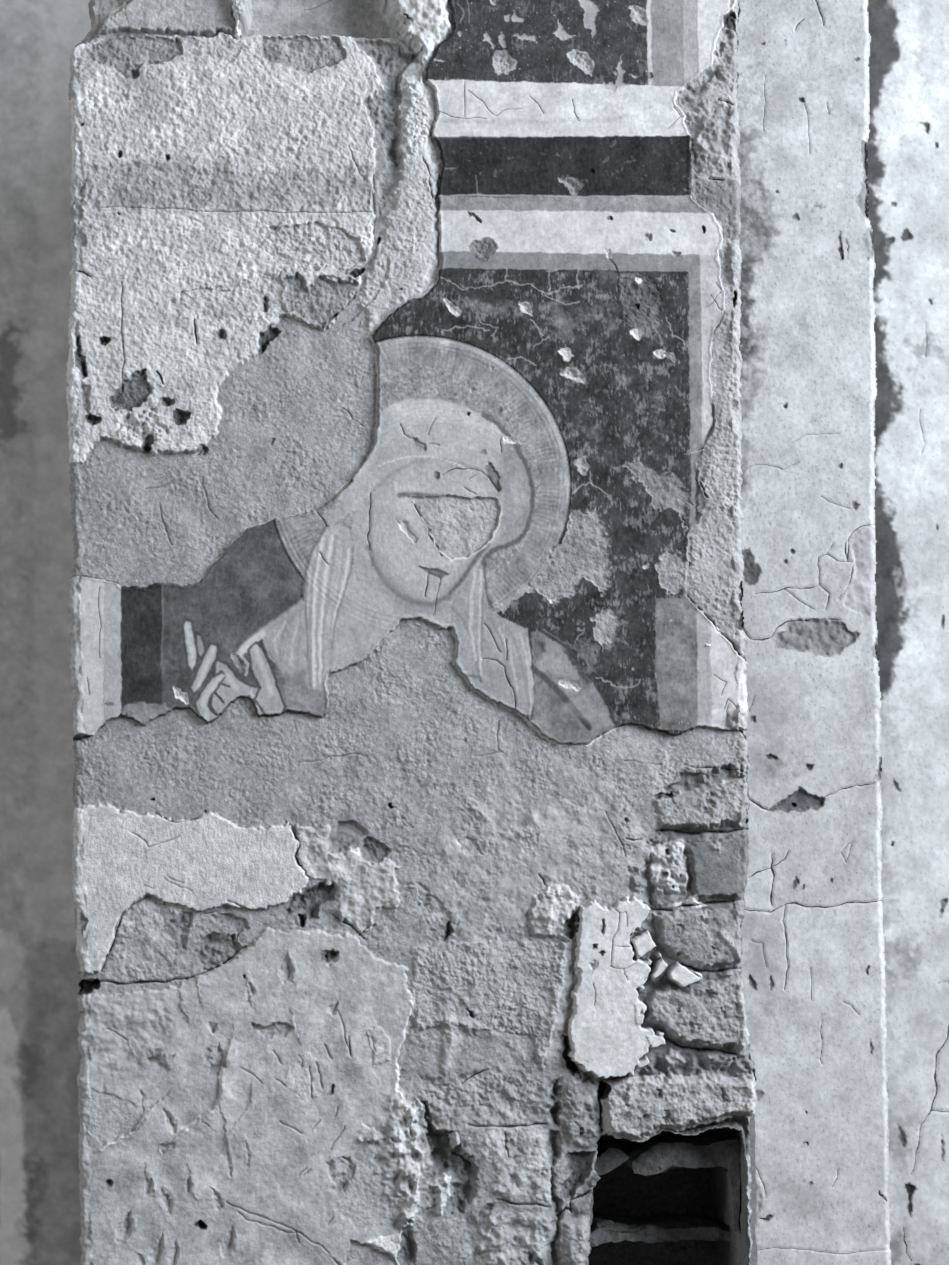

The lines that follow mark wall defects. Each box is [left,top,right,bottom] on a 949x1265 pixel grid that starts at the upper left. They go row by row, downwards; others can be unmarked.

spalling [260,35,420,172]
spalling [168,221,381,354]
spalling [109,368,171,458]
crack [690,496,873,739]
spalling [775,525,875,658]
water stain [892,566,927,632]
crack [690,766,784,810]
crack [82,896,245,985]
spalling [80,895,250,996]
peeling [630,930,730,1068]
spalling [404,1100,479,1216]
crack [911,1026,949,1174]